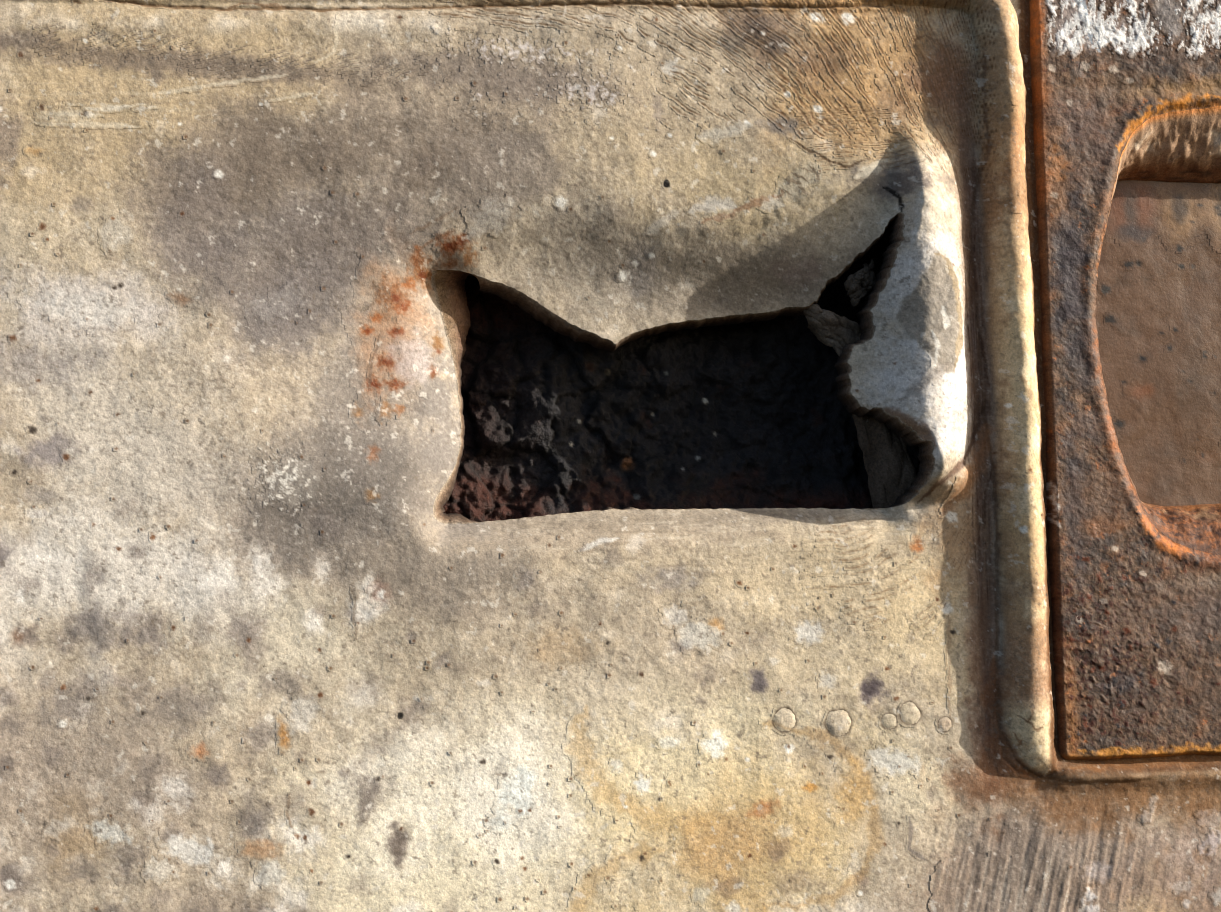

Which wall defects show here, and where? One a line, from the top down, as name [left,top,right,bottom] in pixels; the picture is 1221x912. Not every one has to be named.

corrosion [1029,0,1048,50]
corrosion [1113,90,1221,154]
peeling [853,159,890,180]
corrosion [1045,142,1071,183]
peeling [642,191,786,236]
corrosion [1127,180,1165,229]
corrosion [1094,223,1107,278]
corrosion [339,213,487,467]
peeling [893,250,964,403]
corrosion [1135,505,1199,567]
corrosion [1057,682,1221,794]
damp [562,703,889,912]